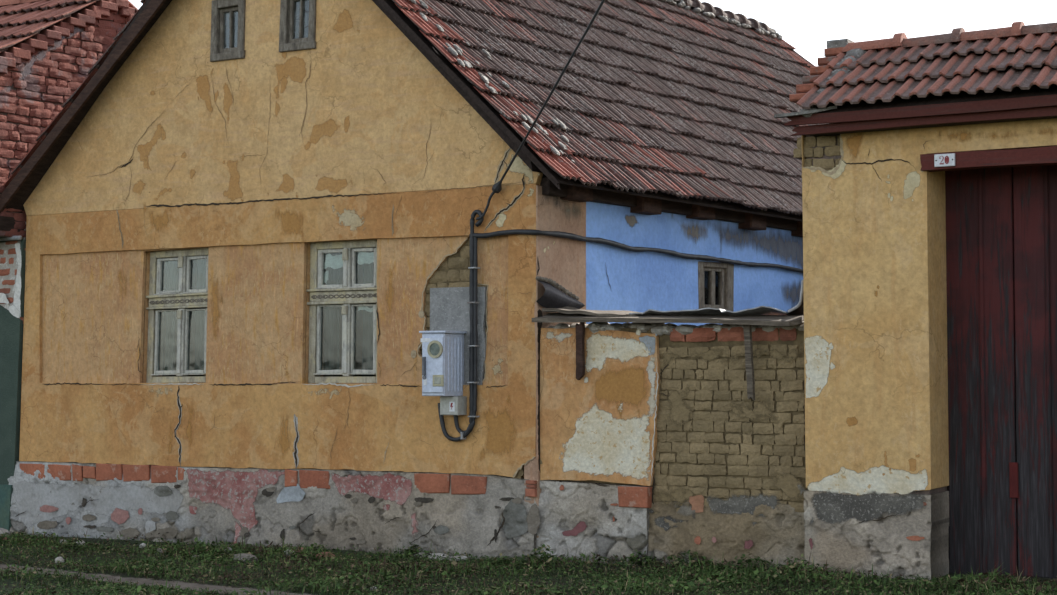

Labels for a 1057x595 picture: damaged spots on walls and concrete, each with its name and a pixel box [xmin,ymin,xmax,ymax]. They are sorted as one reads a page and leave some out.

peeling [274,52,306,117]
crack [299,52,311,138]
crack [95,66,525,248]
peeling [305,116,350,150]
crack [839,141,927,181]
flaking render [0,241,26,324]
flaking render [411,236,488,358]
flaking render [804,335,835,398]
crack [153,386,183,467]
crack [292,414,300,468]
flaking render [494,328,659,542]
flaking render [807,451,928,495]